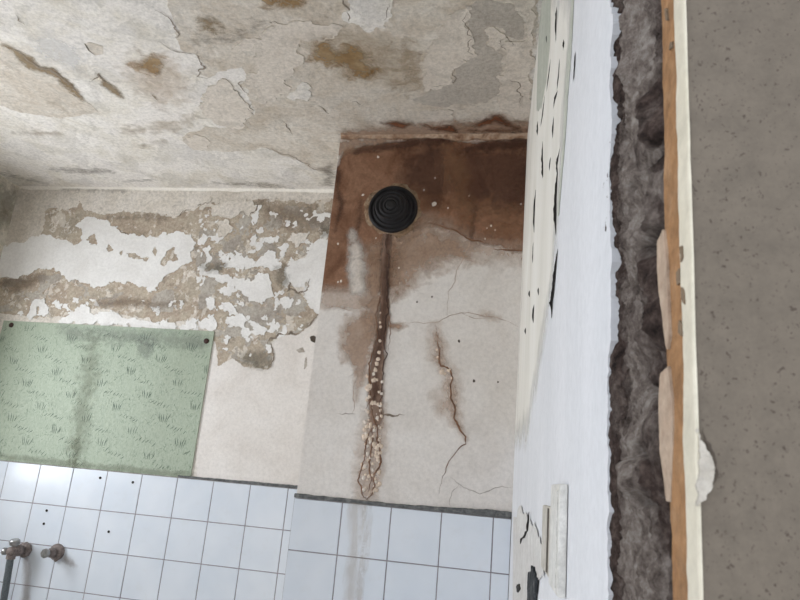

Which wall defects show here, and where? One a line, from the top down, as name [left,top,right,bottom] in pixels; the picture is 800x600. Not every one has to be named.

peeling [0,45,98,119]
peeling [84,42,103,55]
peeling [0,196,333,370]
peeling [156,0,574,439]
crack [388,7,575,504]
spalling [676,246,686,304]
flaking render [695,428,718,506]
spalling [516,565,538,600]